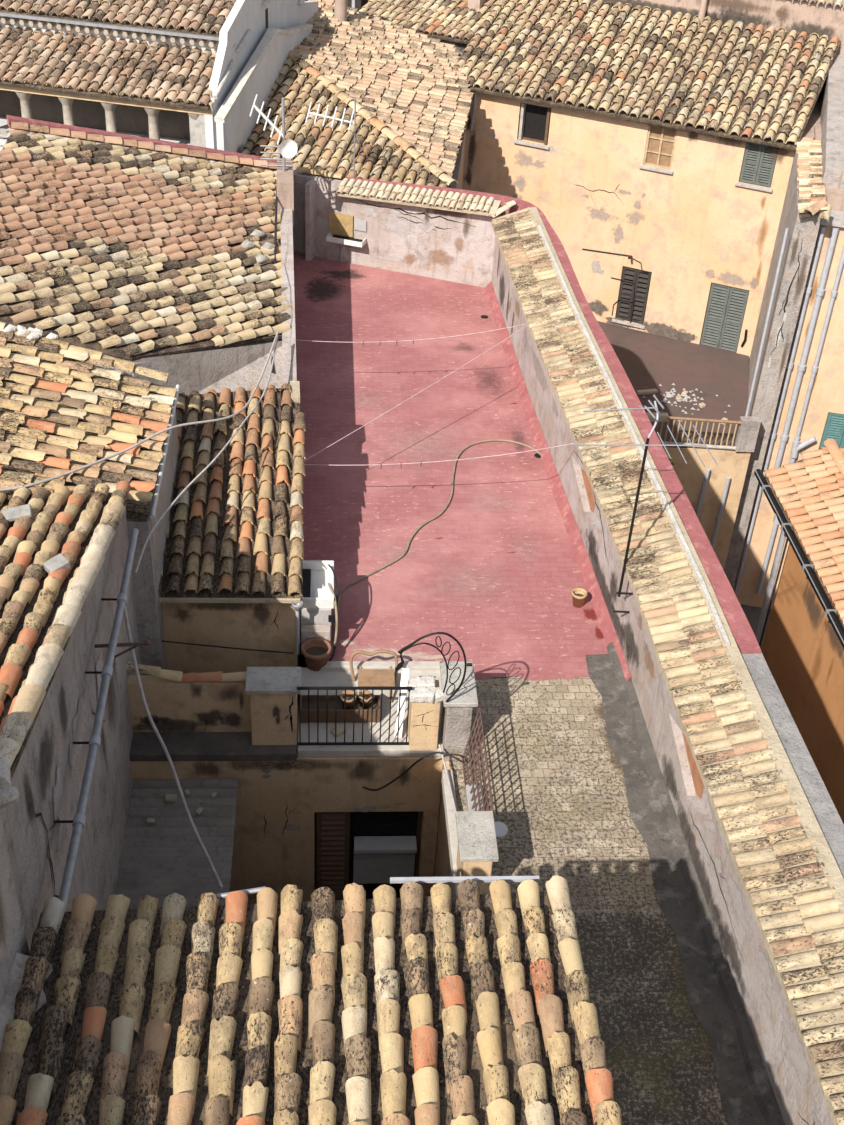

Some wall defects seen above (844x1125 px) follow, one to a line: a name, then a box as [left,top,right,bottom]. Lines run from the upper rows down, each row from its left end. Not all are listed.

damp [308,271,361,301]
crack [771,244,802,353]